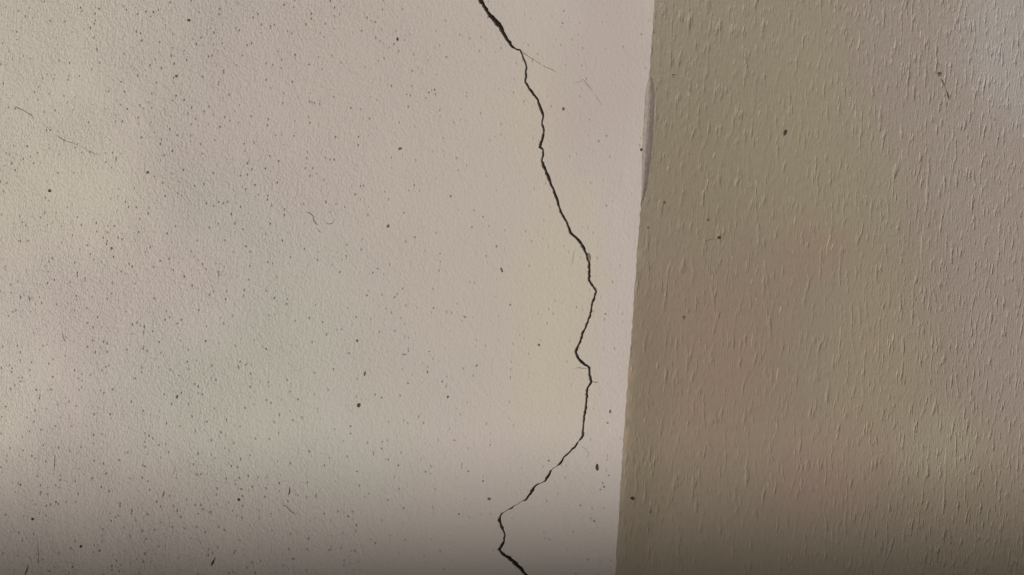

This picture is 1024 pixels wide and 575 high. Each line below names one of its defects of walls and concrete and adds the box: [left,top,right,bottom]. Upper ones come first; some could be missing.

crack [478,0,599,575]